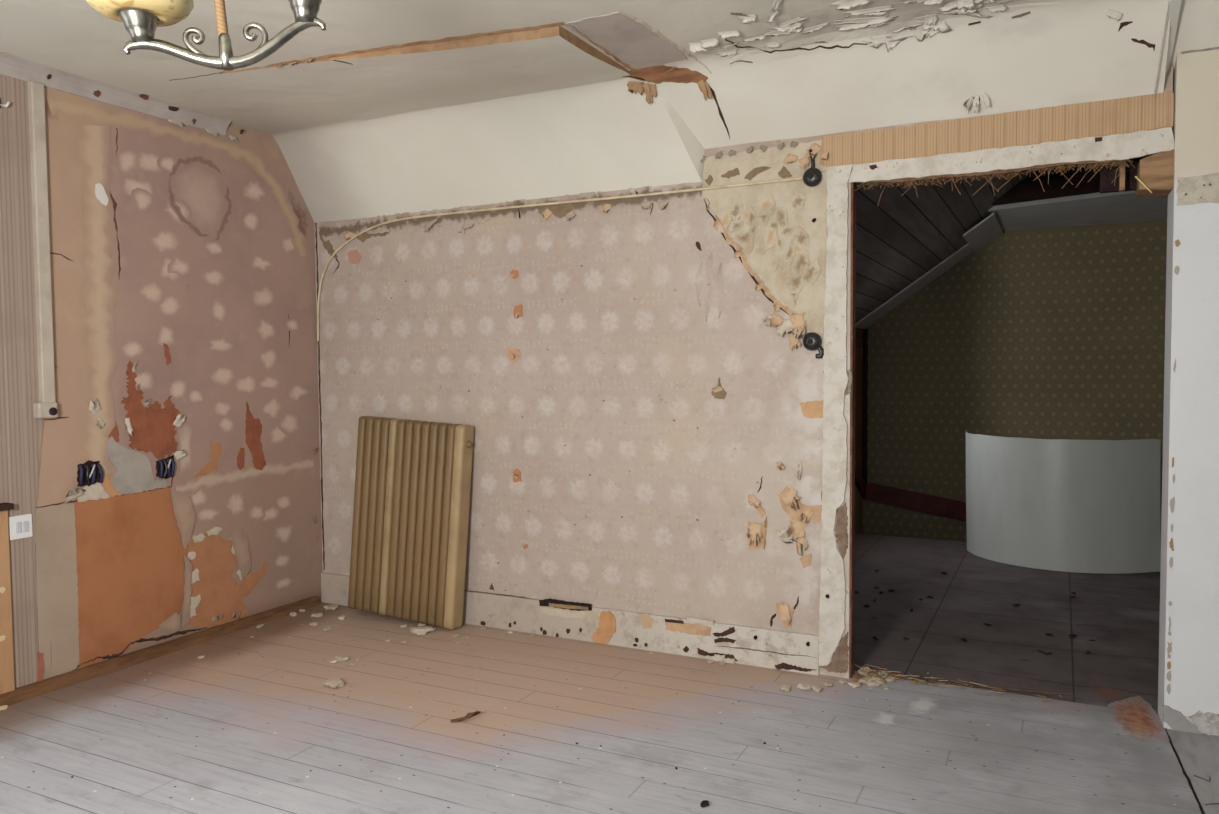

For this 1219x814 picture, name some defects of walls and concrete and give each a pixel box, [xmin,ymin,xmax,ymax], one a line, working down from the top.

peeling [564,0,1092,105]
crack [705,81,730,139]
peeling [963,93,990,114]
leakage [166,154,234,241]
spalling [1176,173,1219,206]
flaking render [318,140,829,351]
peeling [64,360,268,668]
spalling [746,460,848,569]
peeling [532,607,616,643]
peeling [633,613,737,664]
spalling [775,632,849,673]
spalling [1162,601,1219,736]